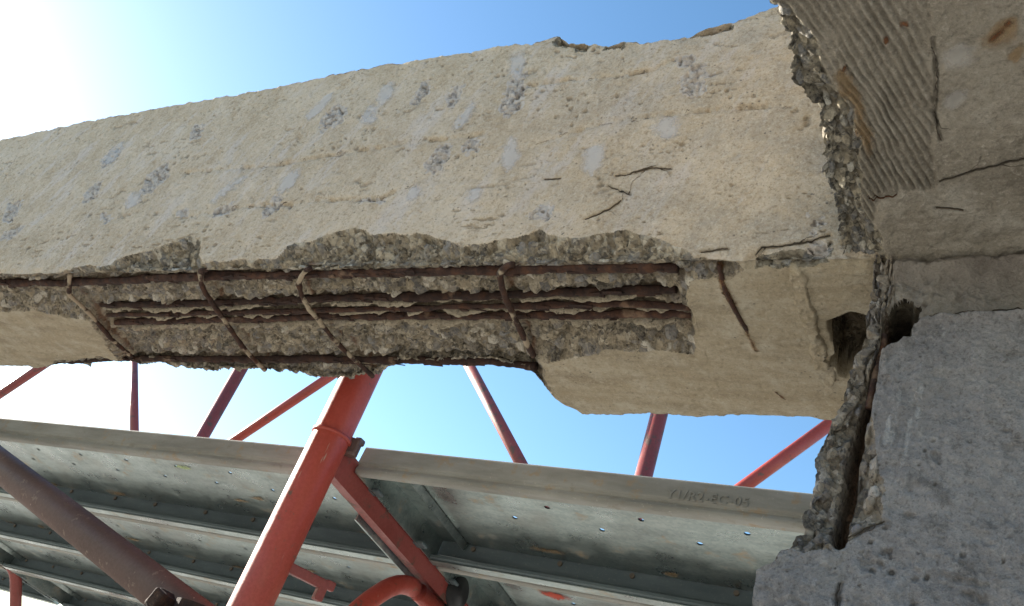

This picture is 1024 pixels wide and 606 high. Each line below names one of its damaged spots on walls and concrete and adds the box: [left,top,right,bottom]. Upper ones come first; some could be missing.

crack [931,47,951,141]
crack [585,165,671,220]
crack [936,158,1024,211]
spalling [0,228,744,397]
corrosion [716,260,758,352]
crack [756,235,830,258]
spalling [754,0,922,553]
crack [847,521,885,542]